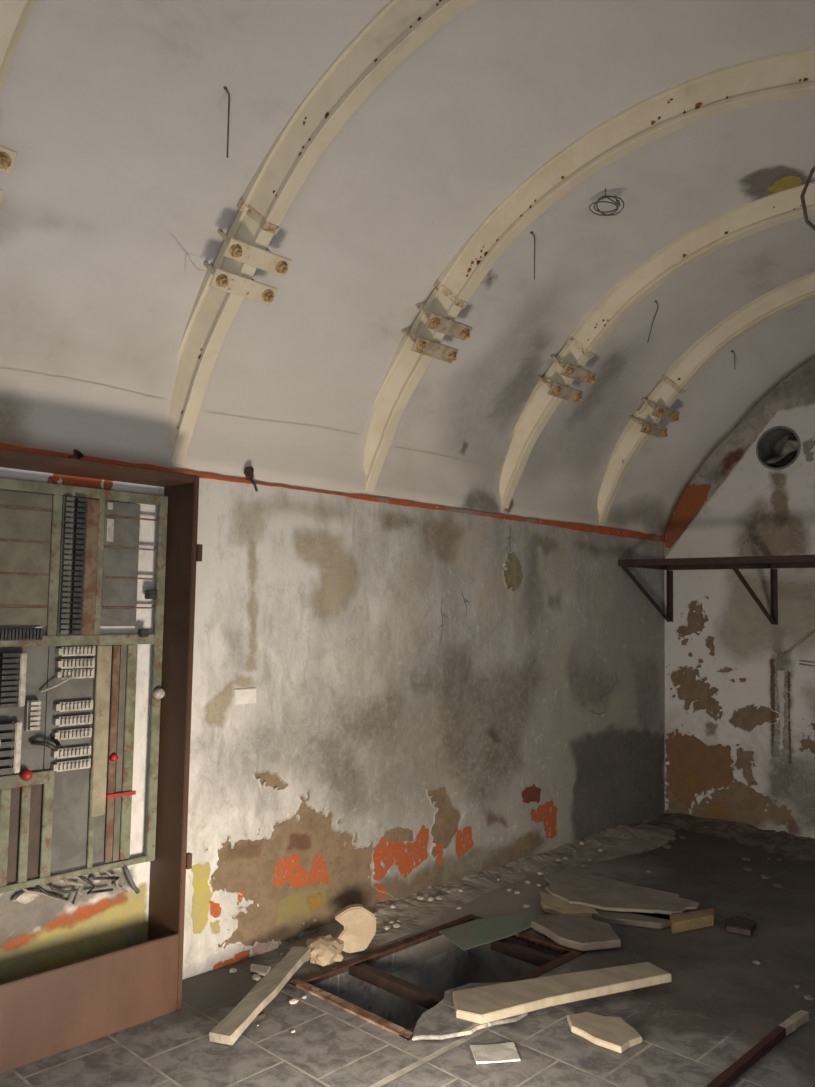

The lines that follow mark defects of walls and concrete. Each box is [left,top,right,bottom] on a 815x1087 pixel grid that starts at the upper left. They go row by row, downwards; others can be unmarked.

flaking render [664,449,743,549]
flaking render [665,595,797,834]
flaking render [252,769,289,792]
water stain [573,730,665,840]
flaking render [191,784,557,976]